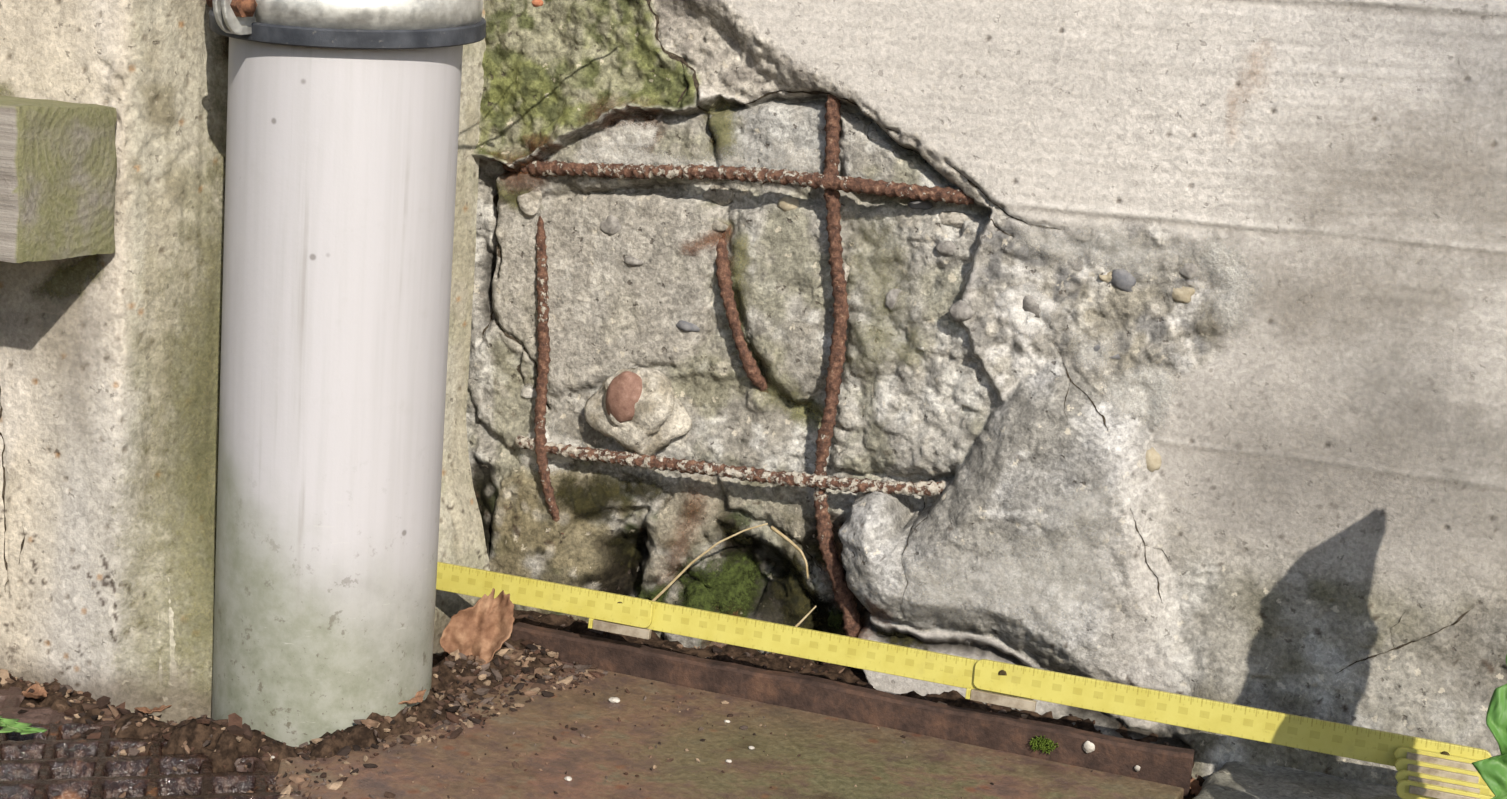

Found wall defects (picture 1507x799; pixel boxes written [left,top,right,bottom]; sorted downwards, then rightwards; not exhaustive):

corrosion [502,94,974,638]
spalling [466,0,1243,636]
crack [0,386,25,592]
spalling [652,630,727,649]
crack [1337,607,1474,673]